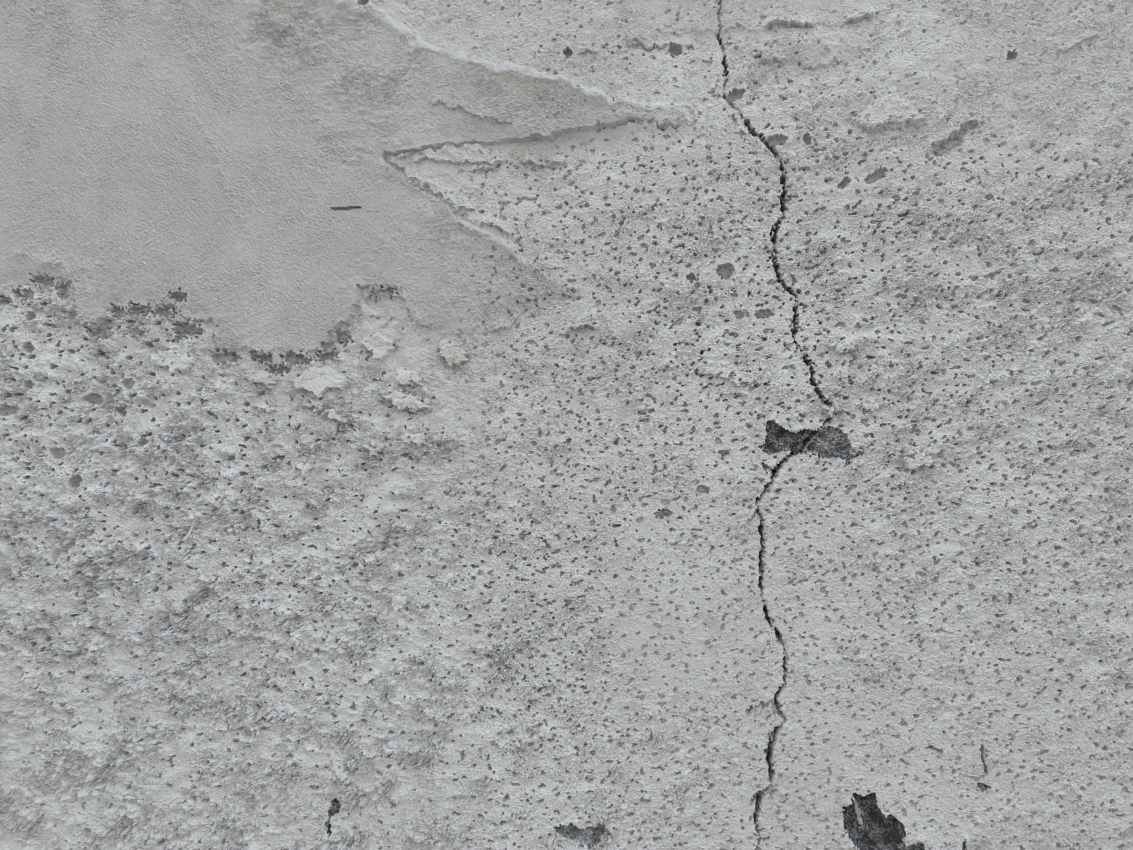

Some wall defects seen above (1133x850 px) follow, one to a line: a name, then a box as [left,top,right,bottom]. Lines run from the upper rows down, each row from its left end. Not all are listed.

spalling [0,269,475,515]
crack [716,0,838,850]
peeling [761,420,859,460]
peeling [321,796,341,841]
peeling [842,792,929,850]